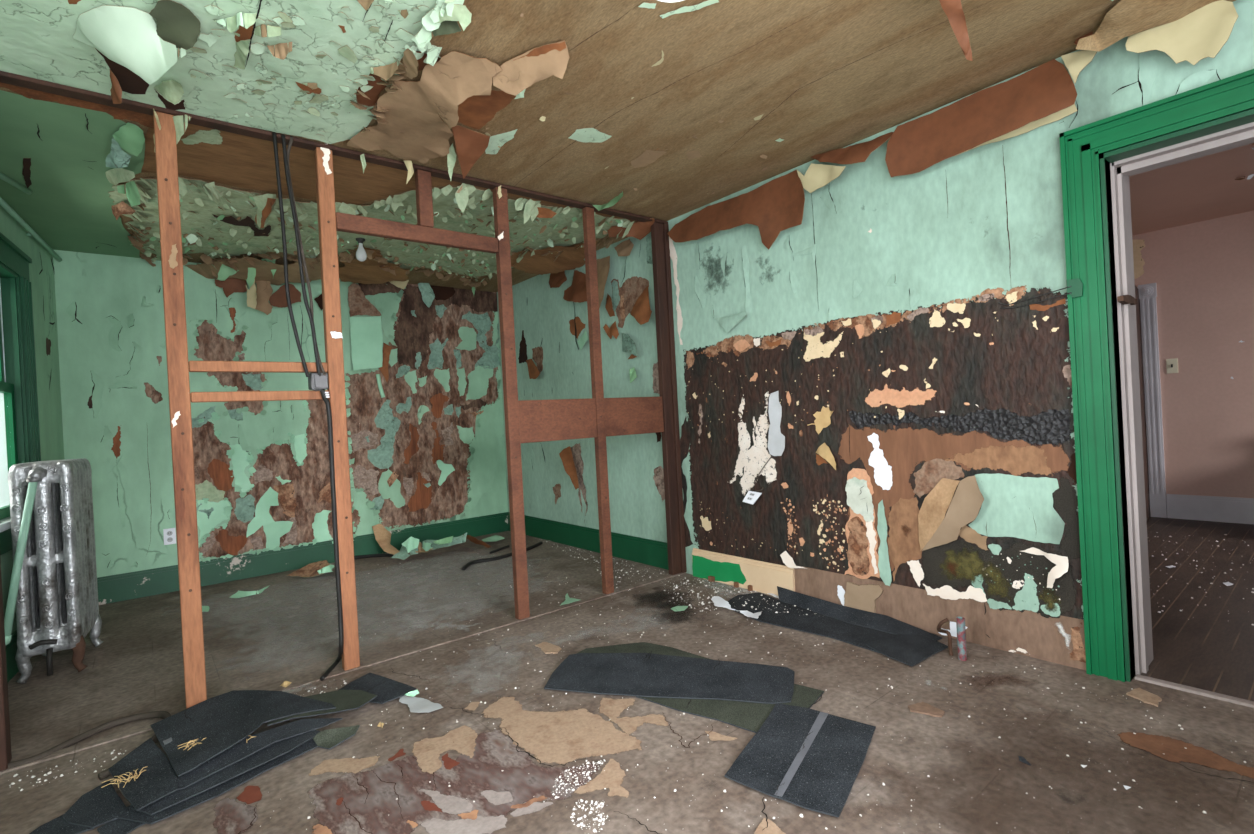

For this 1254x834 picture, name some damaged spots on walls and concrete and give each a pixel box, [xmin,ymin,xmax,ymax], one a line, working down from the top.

peeling [638,0,719,19]
peeling [73,0,472,137]
peeling [105,122,161,267]
peeling [178,177,333,562]
peeling [335,125,653,555]
peeling [768,391,785,456]
peeling [865,384,937,408]
peeling [816,443,836,470]
spalling [1067,453,1077,483]
peeling [918,476,984,551]
peeling [780,551,807,569]
peeling [1021,547,1069,588]